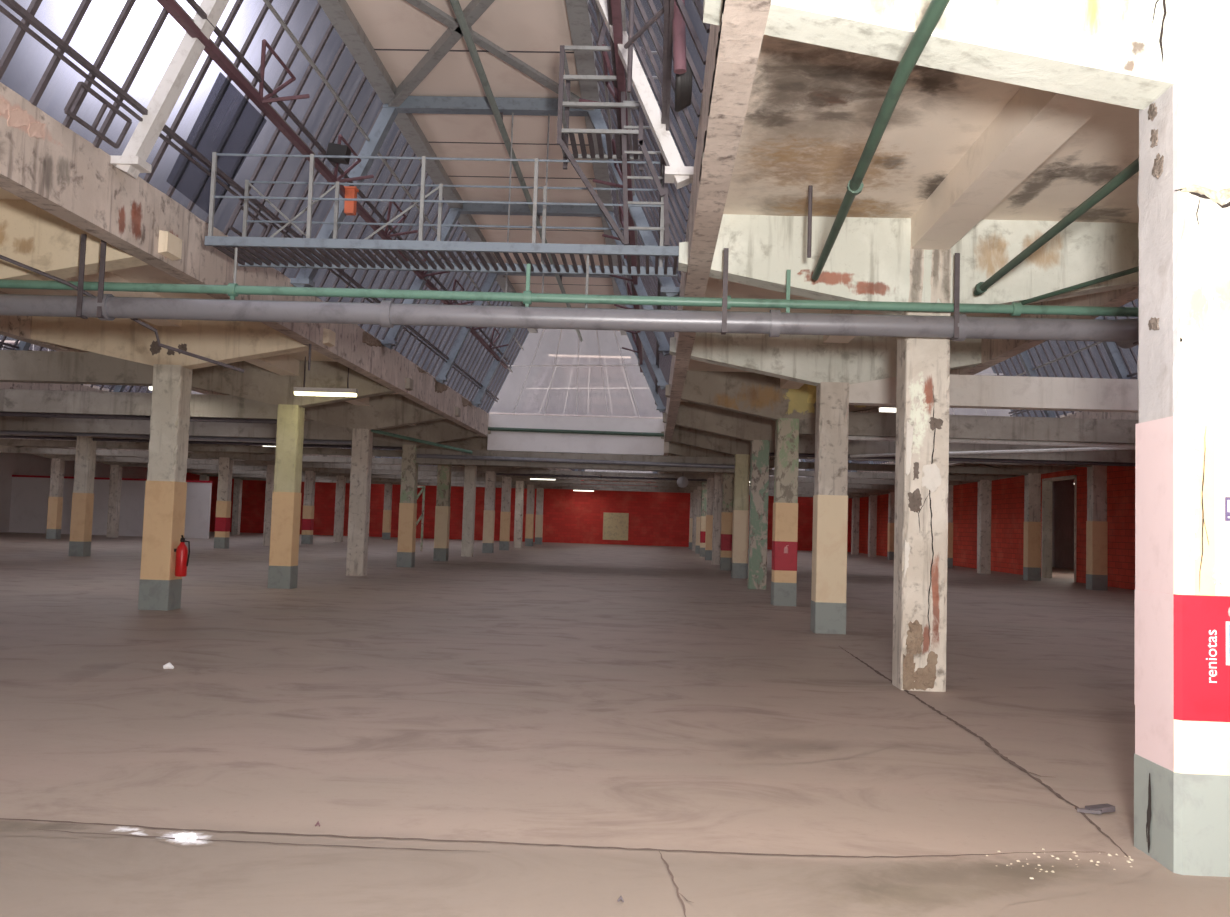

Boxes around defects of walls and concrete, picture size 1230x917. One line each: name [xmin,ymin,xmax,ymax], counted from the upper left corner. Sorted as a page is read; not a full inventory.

damp [840,0,931,31]
damp [932,0,967,39]
crack [1152,0,1167,63]
damp [724,35,1016,218]
damp [40,148,74,199]
damp [967,141,1139,287]
damp [908,246,951,316]
peeling [906,361,943,513]
spalling [903,620,938,690]
crack [839,646,1152,857]